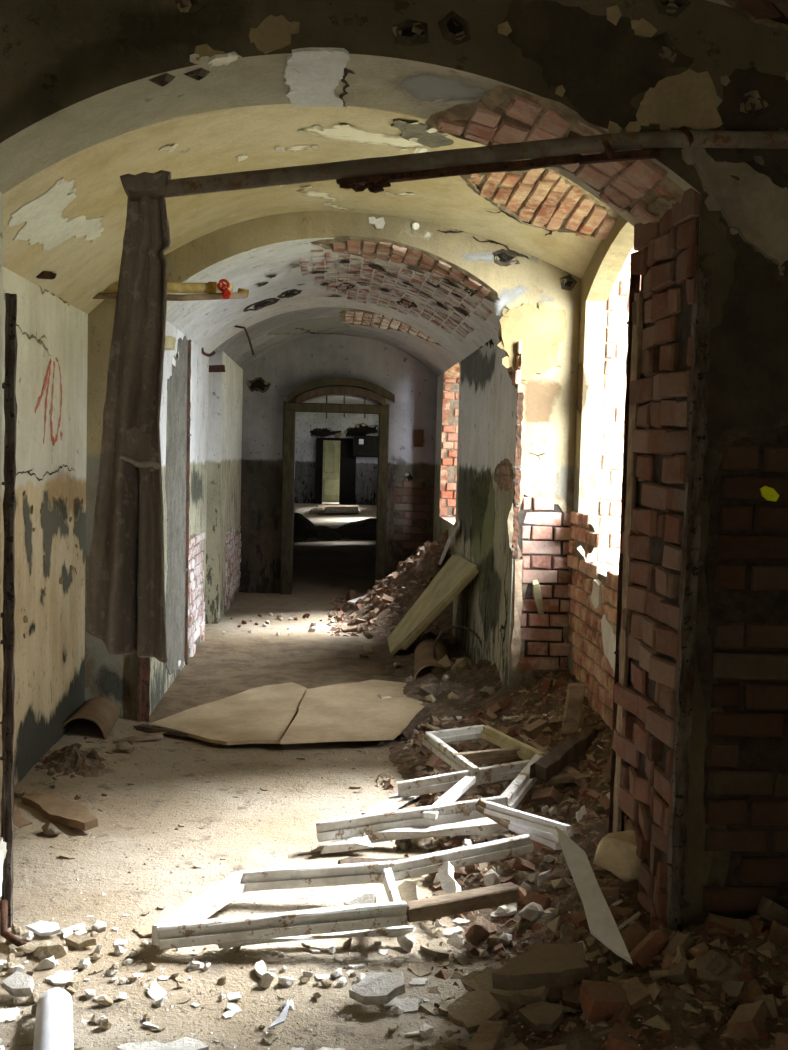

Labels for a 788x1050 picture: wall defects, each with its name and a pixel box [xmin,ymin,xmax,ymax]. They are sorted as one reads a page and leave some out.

peeling [249,15,300,54]
crack [339,51,355,108]
spalling [275,0,788,153]
peeling [8,177,104,250]
corrosion [336,148,664,185]
flaking render [243,217,567,389]
crack [16,464,76,481]
spalling [164,335,206,675]
leakage [458,464,501,641]
flaking render [459,148,788,931]